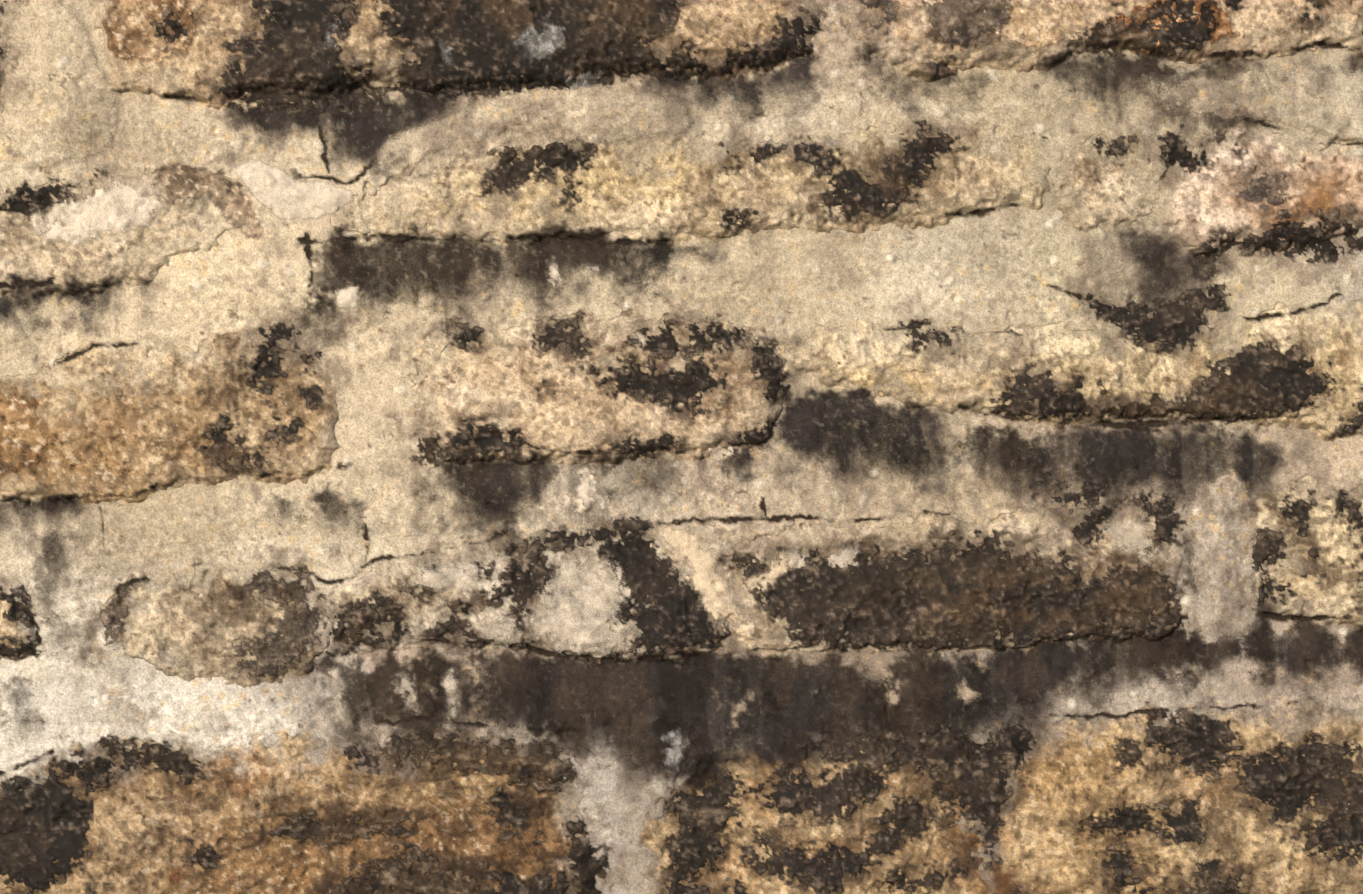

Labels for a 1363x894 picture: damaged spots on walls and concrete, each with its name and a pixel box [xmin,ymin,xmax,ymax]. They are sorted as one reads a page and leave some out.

leakage [522,25,563,60]
leakage [230,82,467,165]
leakage [722,449,751,479]
leakage [770,387,945,480]
leakage [965,423,1281,496]
leakage [306,520,1363,787]